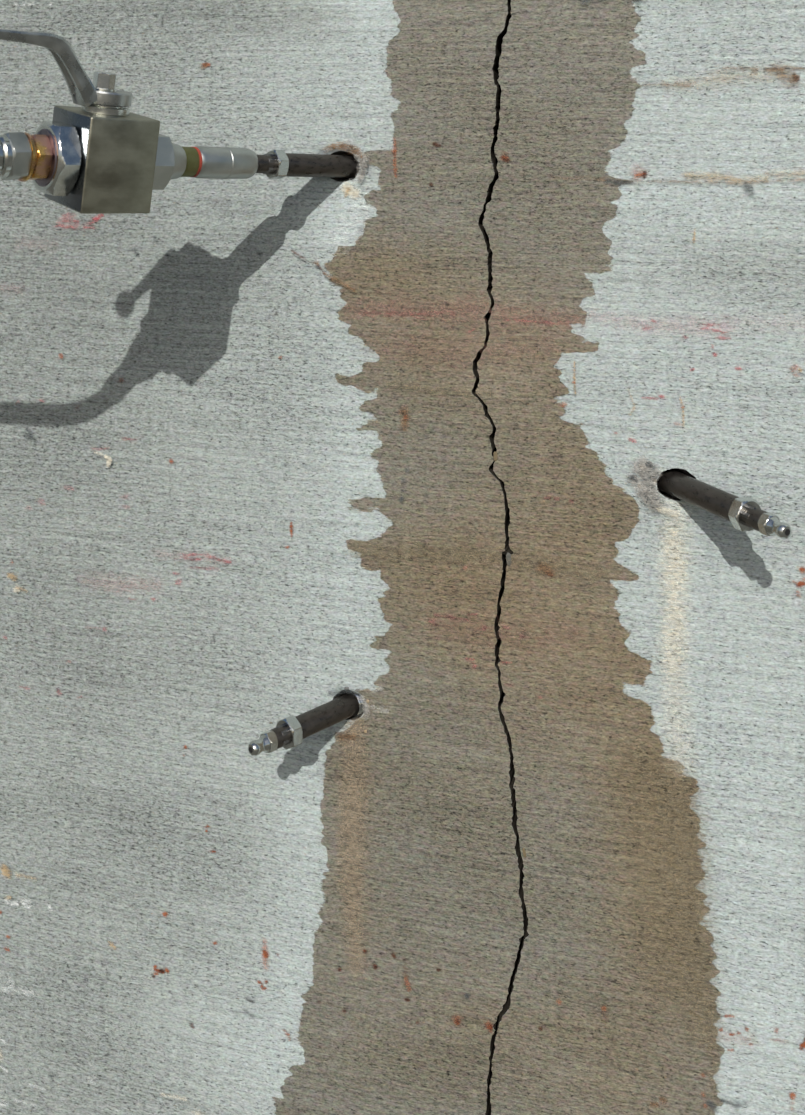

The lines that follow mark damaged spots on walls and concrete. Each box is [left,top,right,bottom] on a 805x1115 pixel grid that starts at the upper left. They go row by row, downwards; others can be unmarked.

crack [472,0,529,1115]
damp [273,0,737,1115]